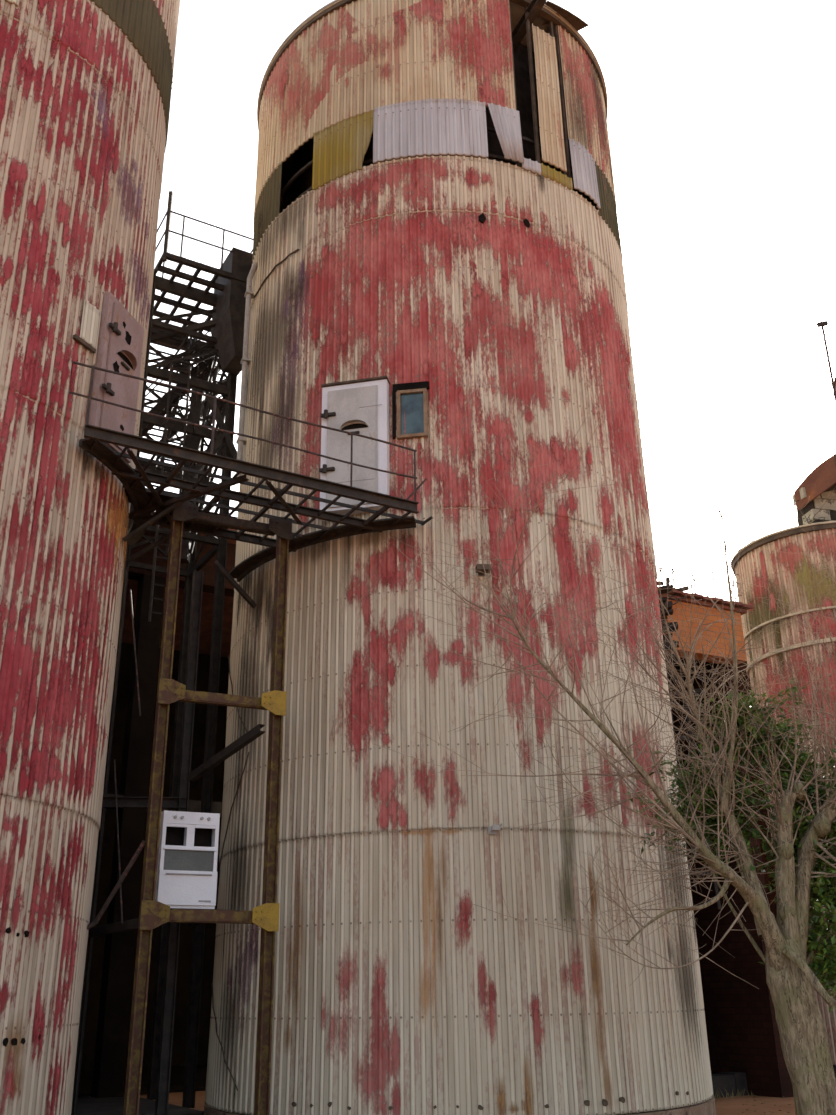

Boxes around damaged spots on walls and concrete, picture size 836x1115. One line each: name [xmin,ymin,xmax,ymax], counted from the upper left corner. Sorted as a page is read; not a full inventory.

peeling [265,0,513,127]
peeling [559,28,609,172]
peeling [290,157,663,770]
peeling [0,0,150,1115]
peeling [749,528,836,612]
peeling [762,597,836,764]
peeling [367,759,465,831]
peeling [456,893,472,942]
peeling [321,958,357,1049]
peeling [357,960,400,1115]
peeling [478,961,496,1038]